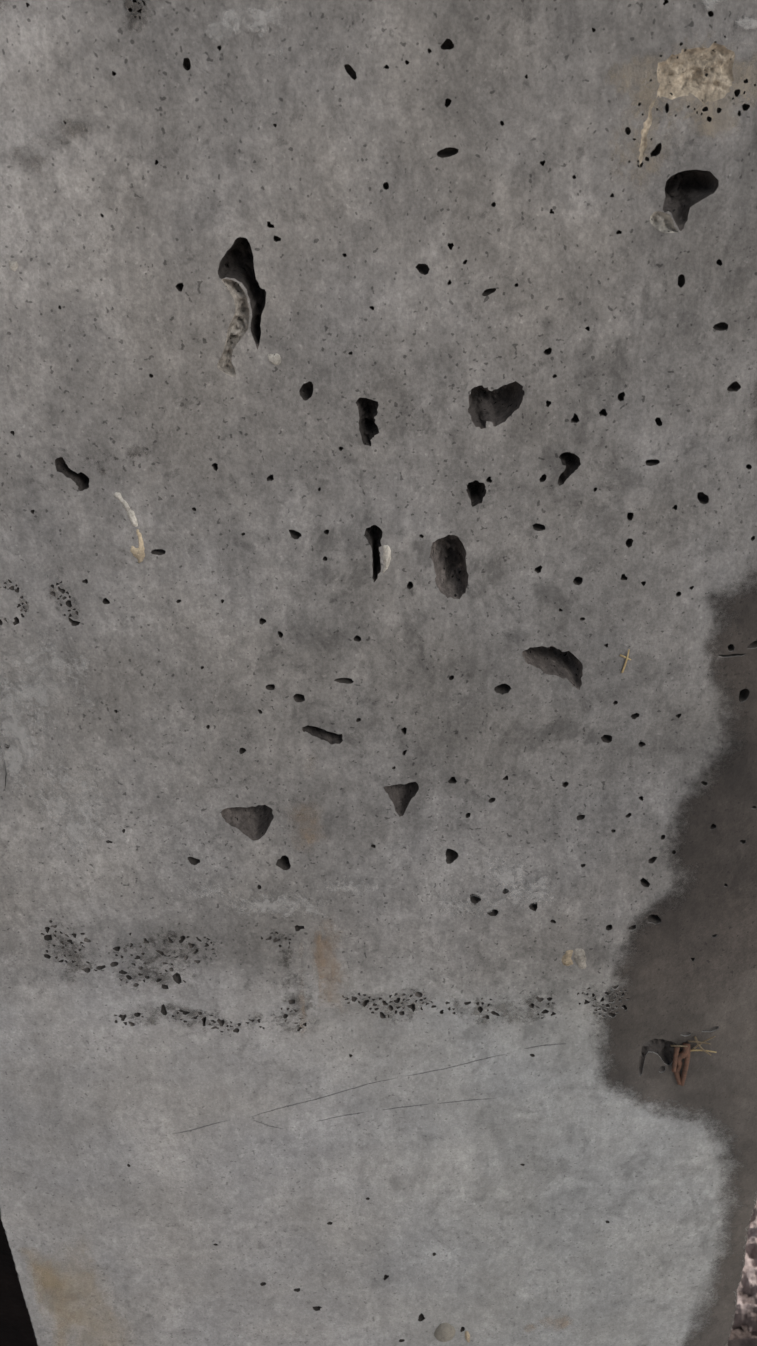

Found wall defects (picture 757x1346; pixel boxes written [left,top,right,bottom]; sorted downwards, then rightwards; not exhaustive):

peeling [611,35,757,233]
damp [600,574,757,1346]